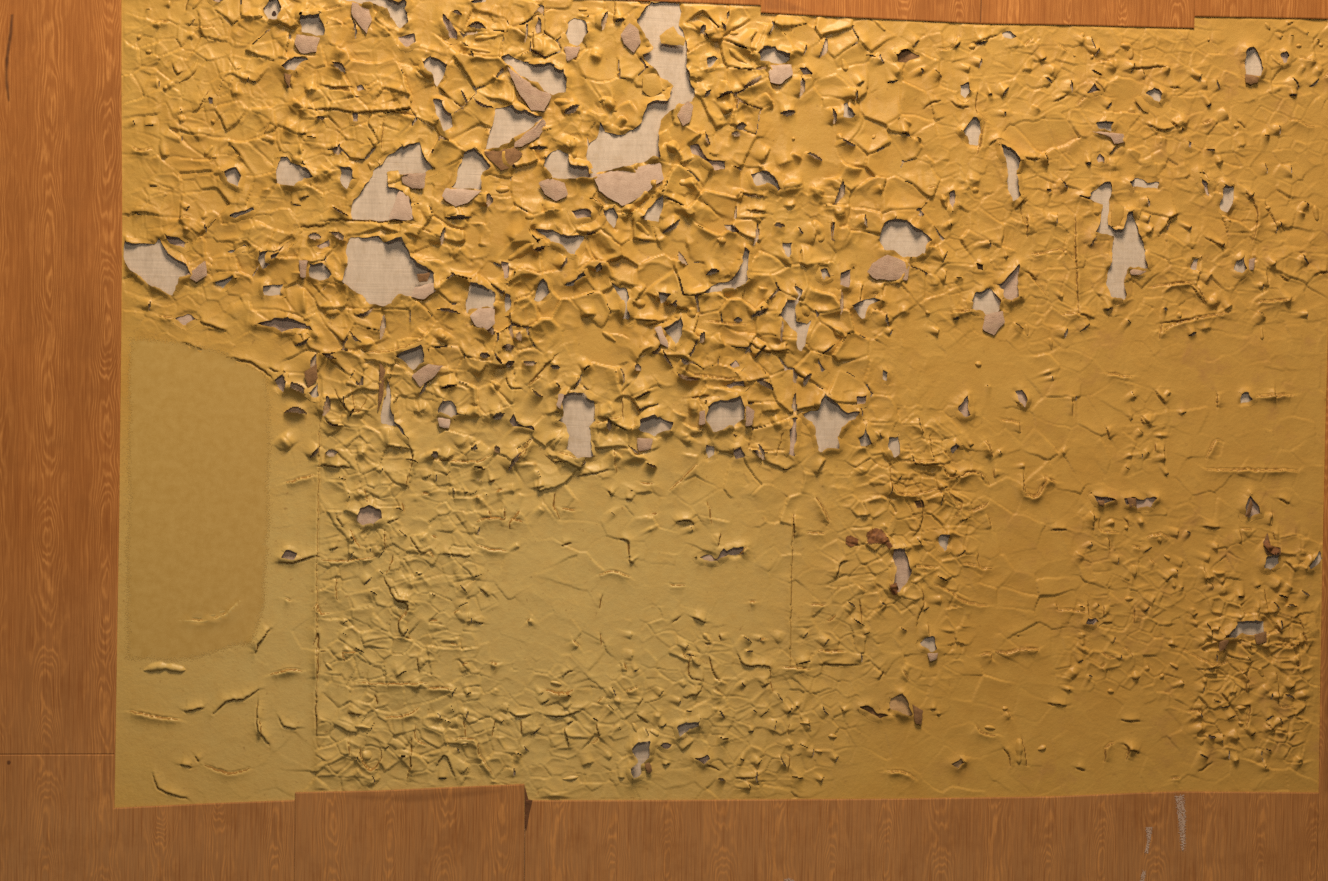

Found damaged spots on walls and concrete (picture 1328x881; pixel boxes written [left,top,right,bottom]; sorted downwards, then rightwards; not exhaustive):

peeling [753,41,817,84]
crack [159,315,278,378]
peeling [124,0,722,339]
crack [506,354,557,389]
peeling [699,360,754,463]
crack [709,321,789,354]
peeling [775,212,936,460]
peeling [966,259,1025,335]
peeling [1079,154,1165,305]
crack [130,389,747,799]
crack [671,497,908,698]
crack [1149,589,1308,728]